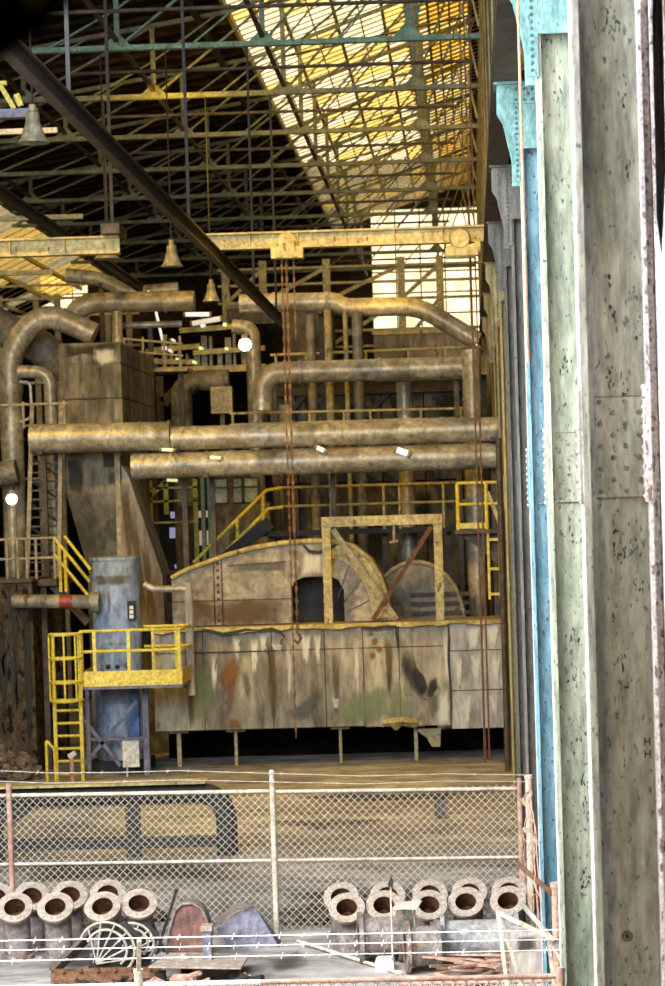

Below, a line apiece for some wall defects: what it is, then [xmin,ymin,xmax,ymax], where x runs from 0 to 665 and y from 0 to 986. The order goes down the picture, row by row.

water stain [188,660,217,719]
corrosion [222,659,239,701]
water stain [244,637,291,714]
water stain [302,638,320,661]
water stain [342,625,498,723]
water stain [492,658,500,681]